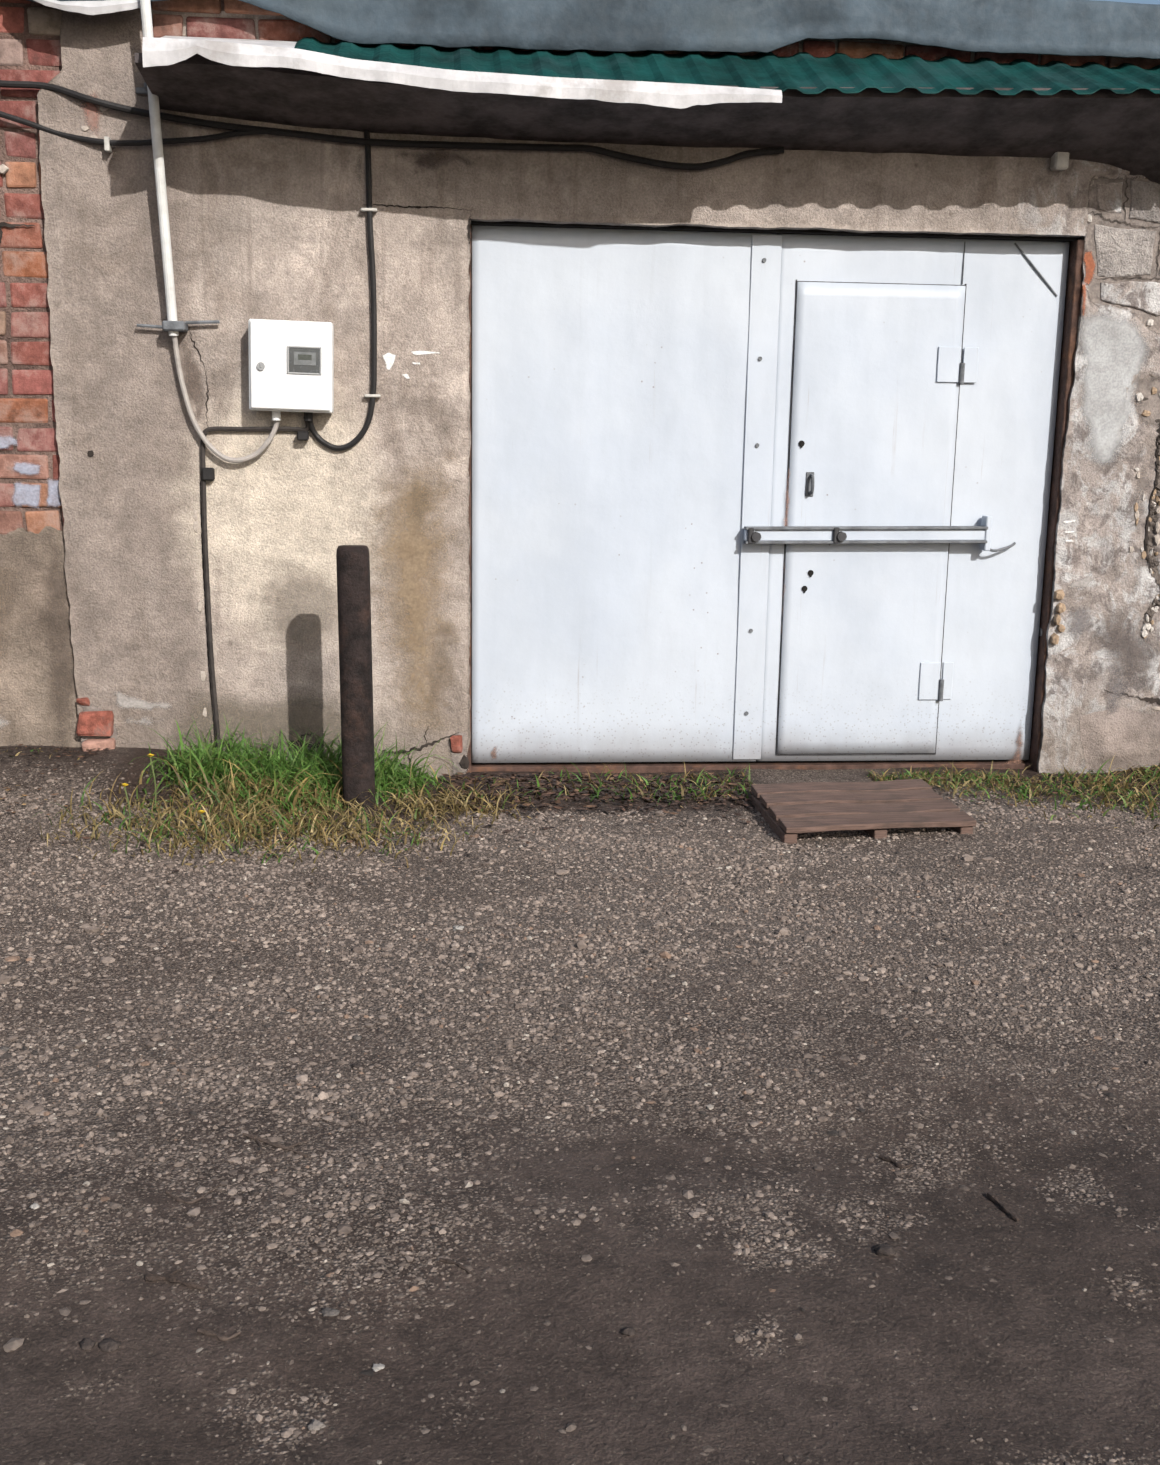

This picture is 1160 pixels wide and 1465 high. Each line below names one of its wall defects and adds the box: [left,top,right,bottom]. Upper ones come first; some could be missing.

flaking render [1085,177,1160,334]
peeling [0,436,17,448]
peeling [13,463,61,506]
crack [1104,689,1160,710]
spalling [76,697,118,752]